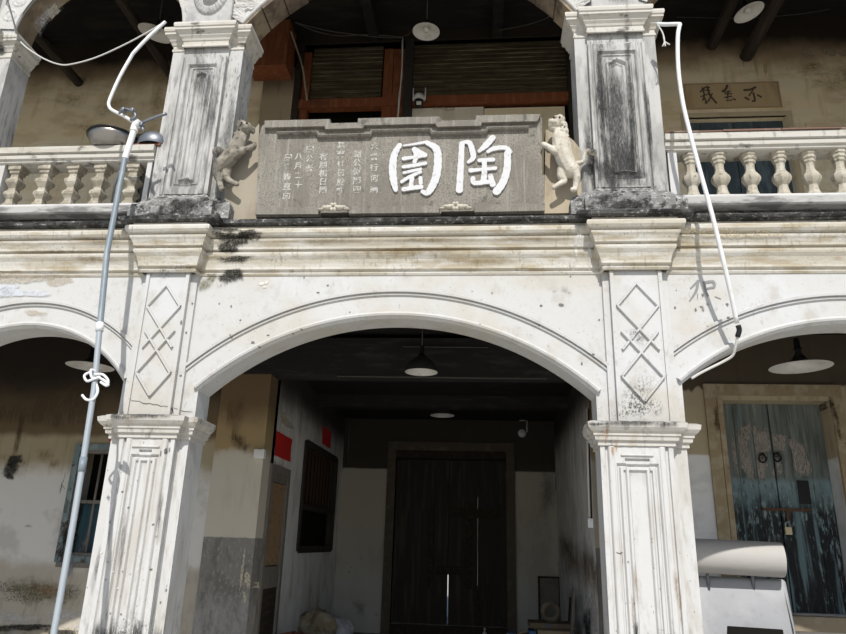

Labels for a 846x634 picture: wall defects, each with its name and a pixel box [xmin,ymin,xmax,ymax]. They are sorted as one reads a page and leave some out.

water stain [585,34,641,189]
water stain [644,92,653,167]
mould [215,228,262,286]
water stain [3,455,22,479]